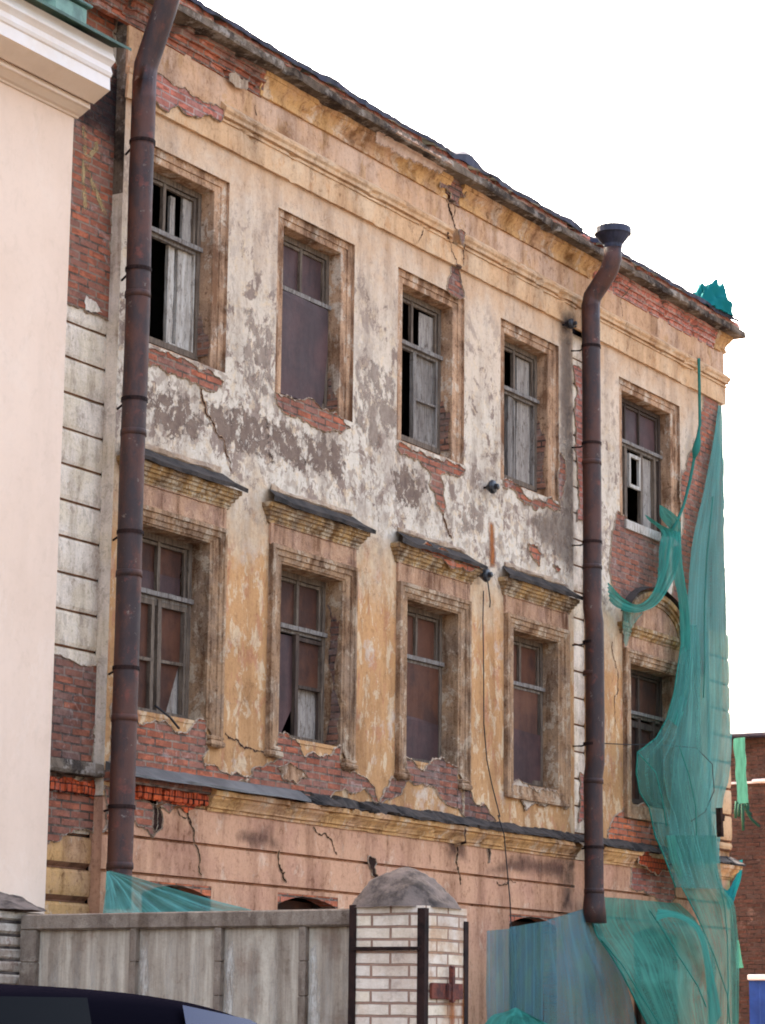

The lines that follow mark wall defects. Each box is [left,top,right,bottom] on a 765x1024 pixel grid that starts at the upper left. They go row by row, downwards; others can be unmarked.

flaking render [67,103,114,321]
crack [418,176,492,266]
crack [200,389,232,471]
peeling [147,310,466,514]
flaking render [672,395,719,601]
flaking render [608,510,660,599]
flaking render [50,654,98,763]
flaking render [47,772,109,844]
crack [156,803,202,875]
crack [277,850,287,883]
flaking render [134,718,497,839]
crack [313,827,337,855]